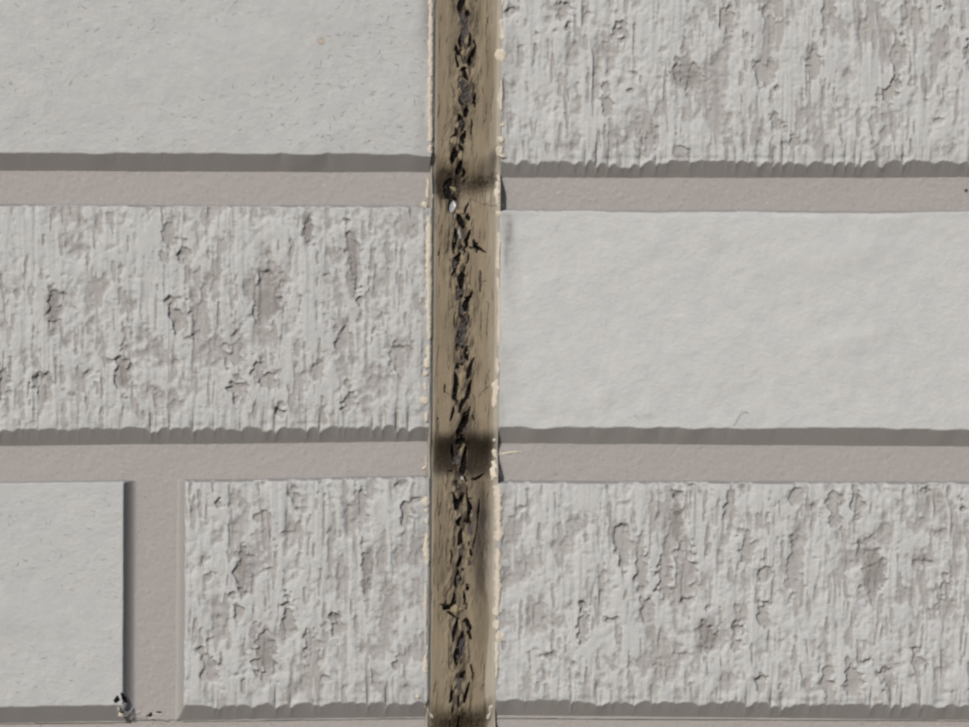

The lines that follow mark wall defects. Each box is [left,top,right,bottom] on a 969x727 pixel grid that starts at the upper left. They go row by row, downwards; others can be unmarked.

crack [0,212,190,405]